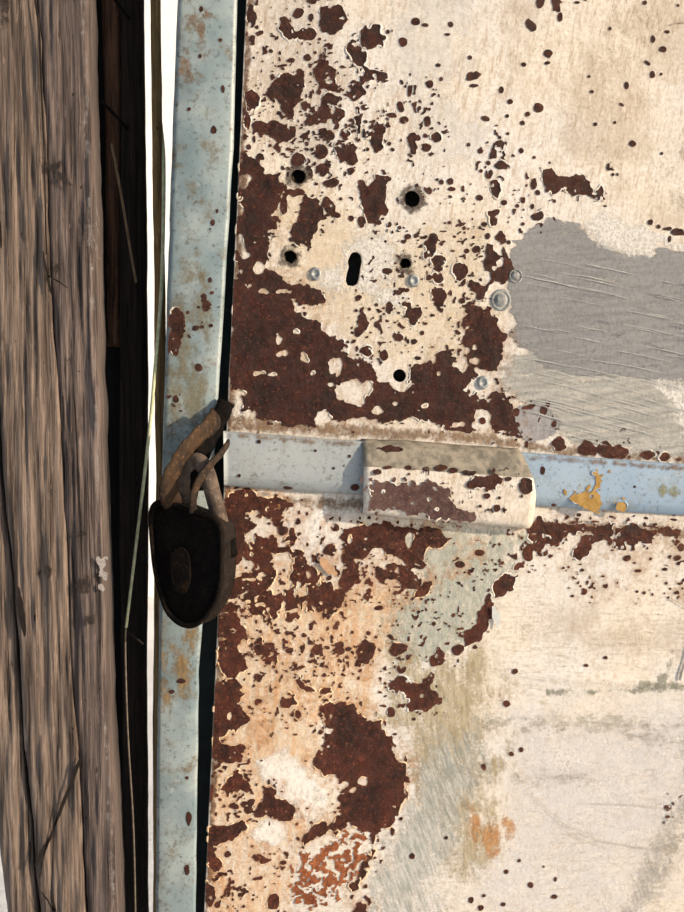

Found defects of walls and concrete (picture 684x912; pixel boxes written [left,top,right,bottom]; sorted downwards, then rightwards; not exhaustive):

rust [166,272,220,436]
rust [188,6,210,42]
rust [229,0,684,463]
rust [205,464,684,912]